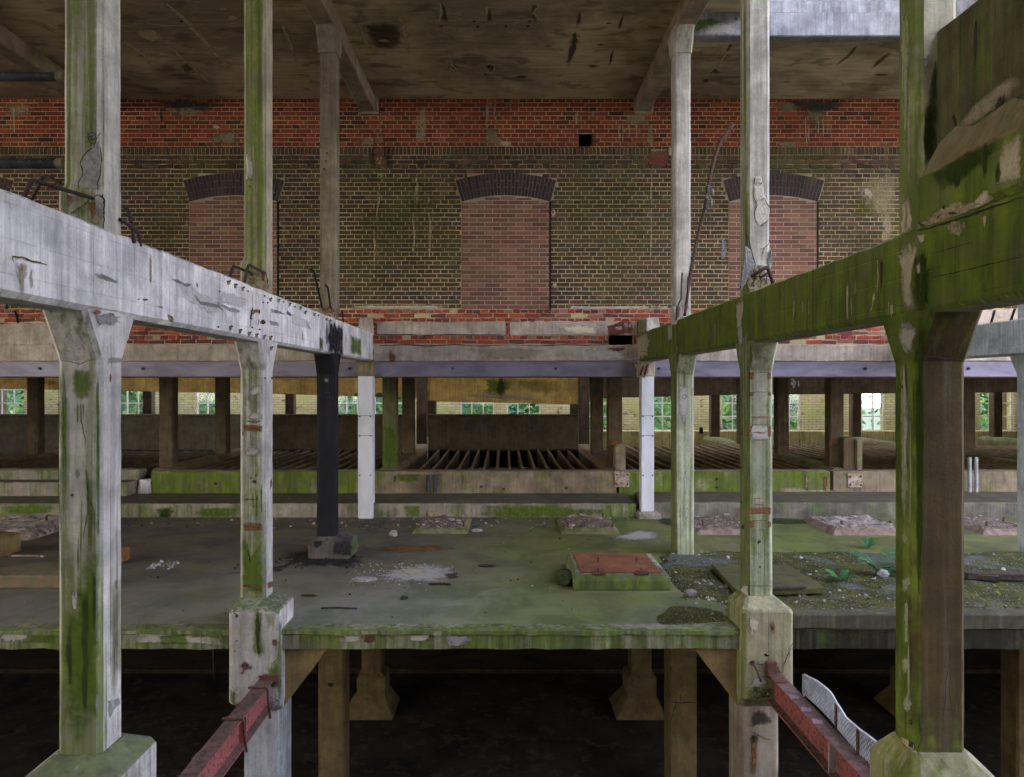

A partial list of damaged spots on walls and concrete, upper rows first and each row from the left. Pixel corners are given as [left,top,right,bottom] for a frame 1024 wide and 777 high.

spalling [21,133,105,227]
spalling [753,175,770,227]
damp [863,178,894,239]
peeling [888,136,1021,353]
damp [320,324,354,352]
damp [58,362,112,568]
damp [67,577,96,709]